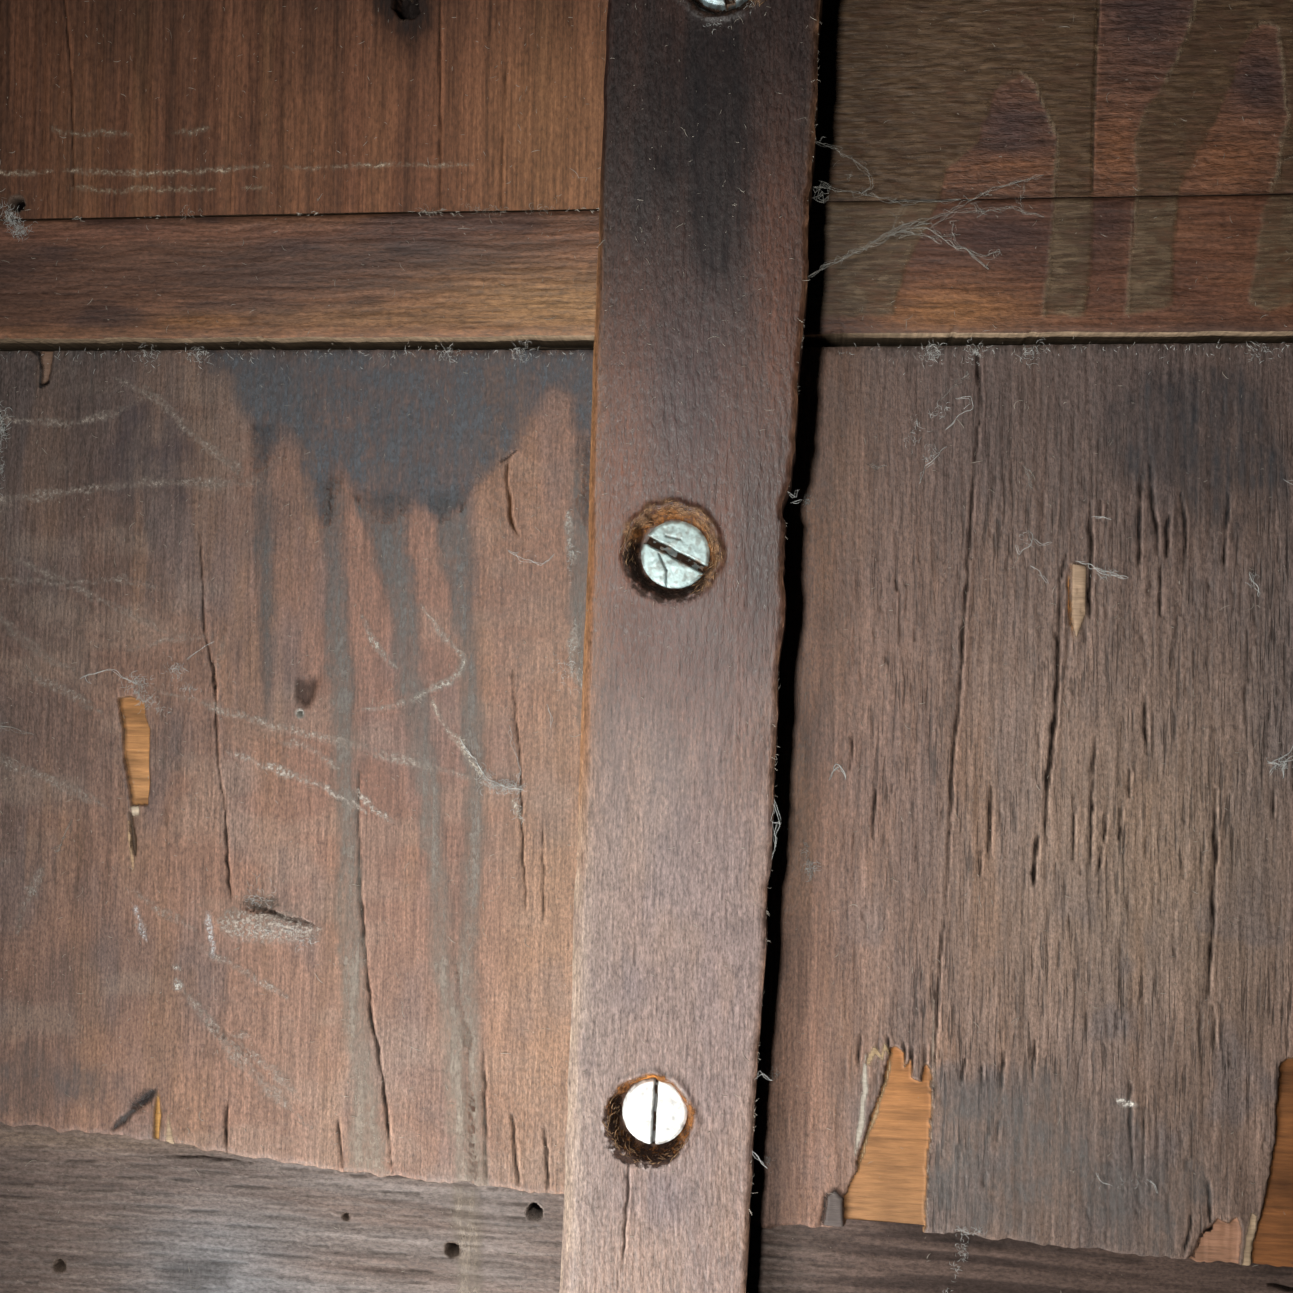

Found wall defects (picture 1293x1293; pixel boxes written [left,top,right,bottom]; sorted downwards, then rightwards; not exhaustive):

peeling [119,696,150,869]
crack [200,550,231,896]
leakage [297,480,383,1169]
crack [357,786,392,1164]
leakage [354,496,486,1293]
peeling [820,1018,935,1232]
crack [1031,501,1147,883]
peeling [1188,1058,1293,1267]